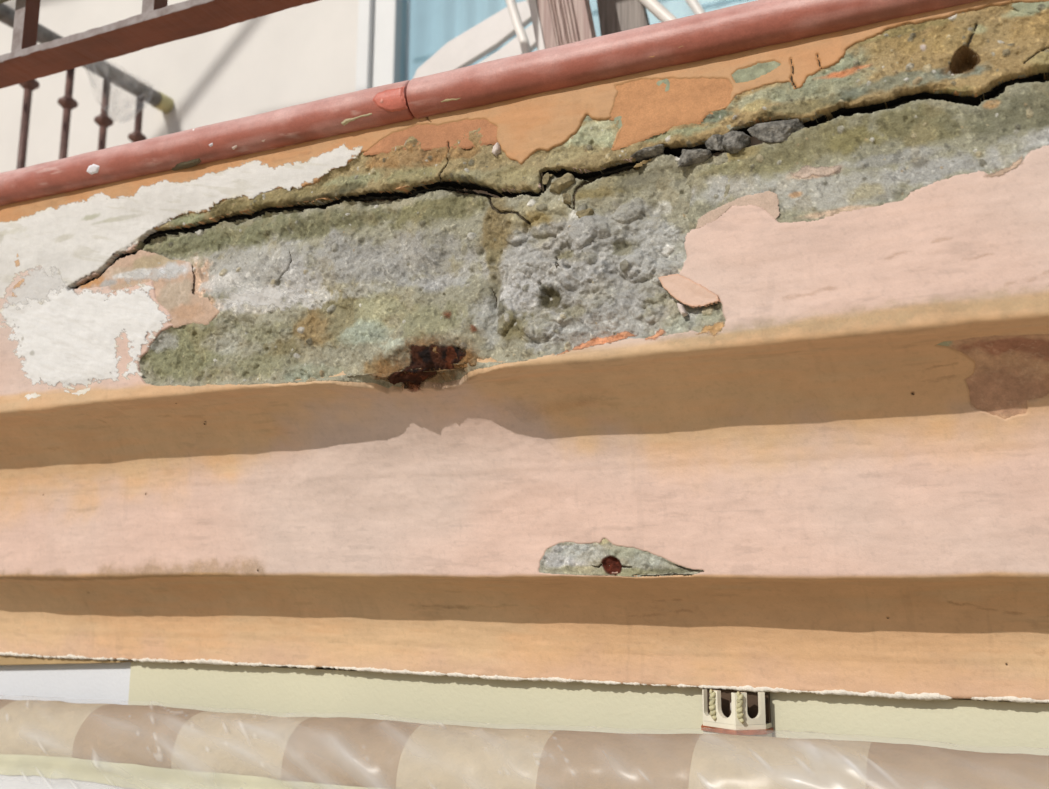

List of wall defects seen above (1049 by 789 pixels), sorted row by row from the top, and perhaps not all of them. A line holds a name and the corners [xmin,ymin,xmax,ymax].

crack [737,48,1049,147]
crack [71,143,721,289]
spalling [77,1,1049,388]
corrosion [375,340,472,392]
peeling [937,334,1049,419]
corrosion [601,556,622,575]
spalling [539,538,704,577]